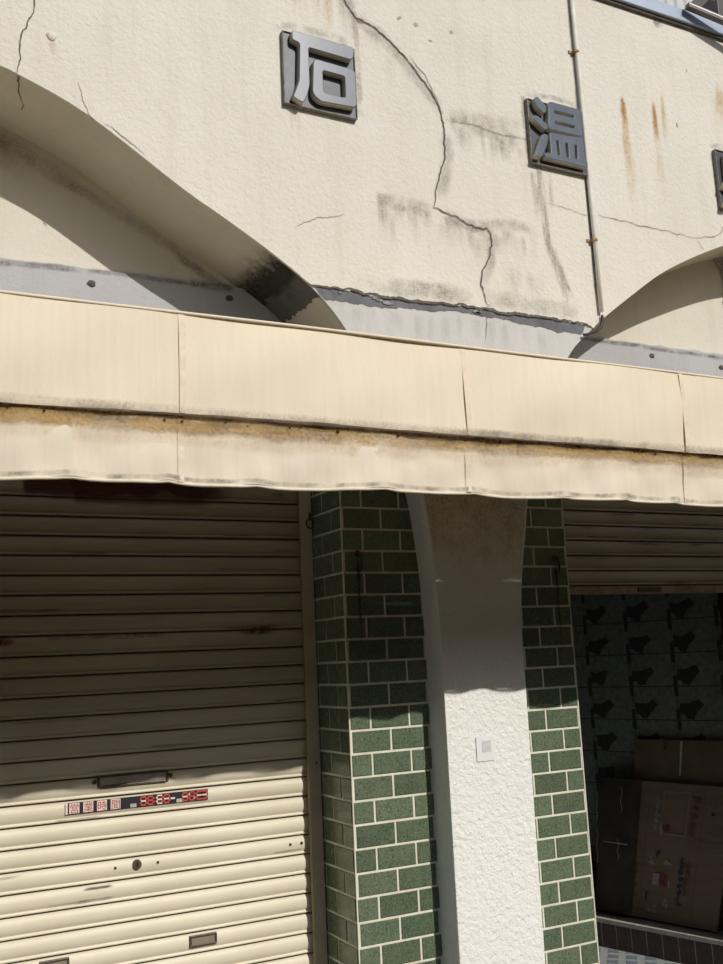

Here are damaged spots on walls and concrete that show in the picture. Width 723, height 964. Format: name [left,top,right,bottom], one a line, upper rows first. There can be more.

crack [17,0,35,110]
crack [312,0,592,339]
water stain [241,259,320,323]